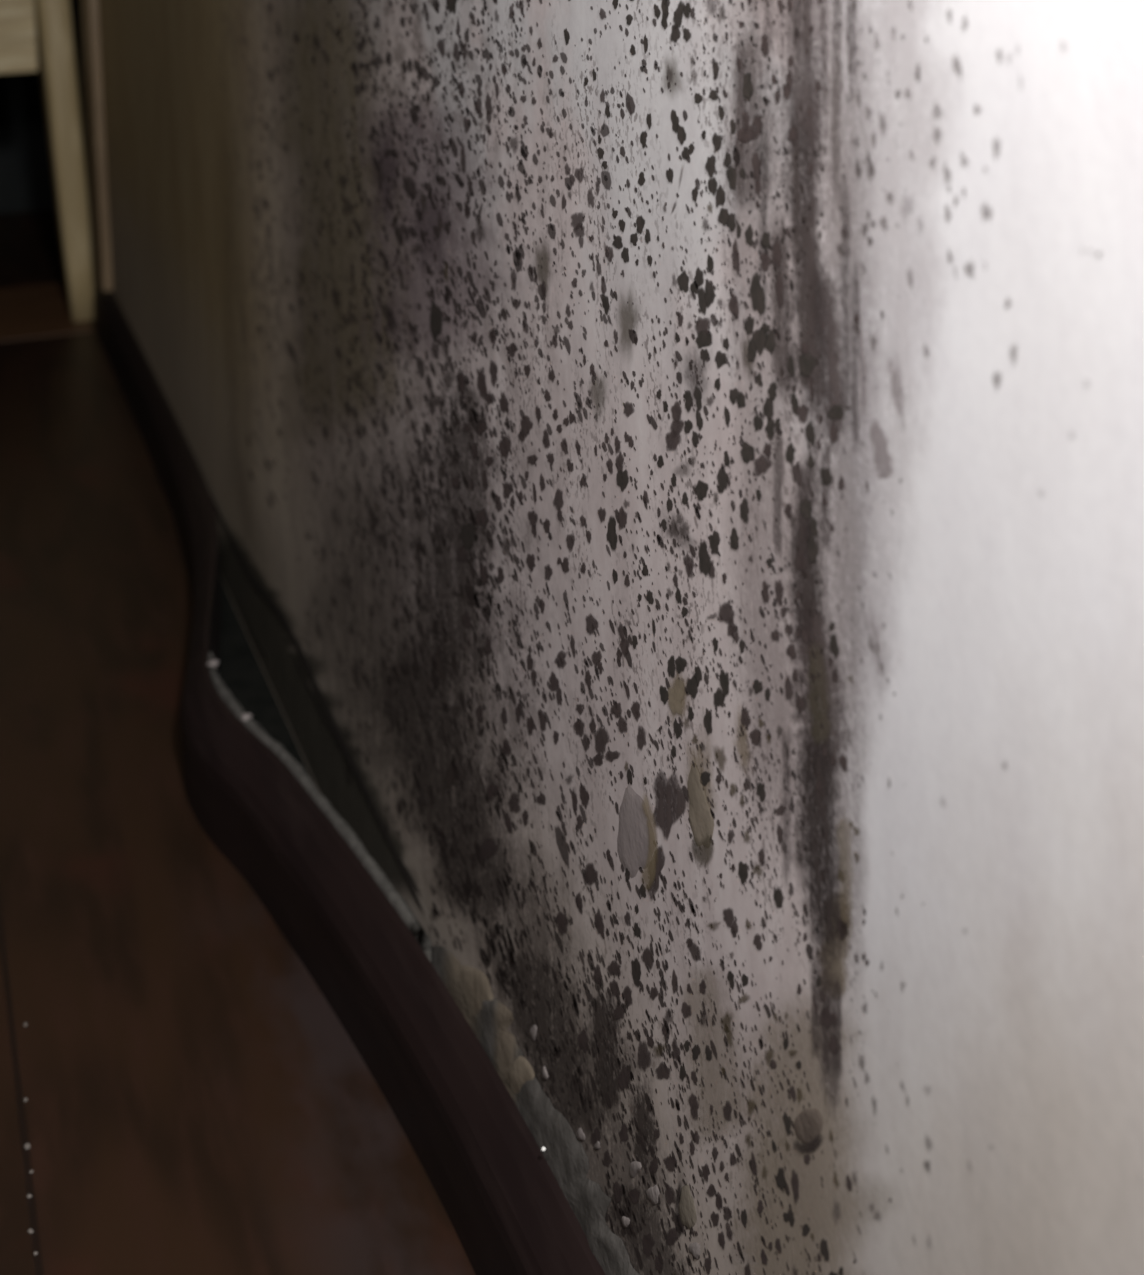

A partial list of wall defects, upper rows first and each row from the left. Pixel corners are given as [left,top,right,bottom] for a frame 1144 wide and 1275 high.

leakage [218,0,869,1275]
peeling [649,772,686,898]